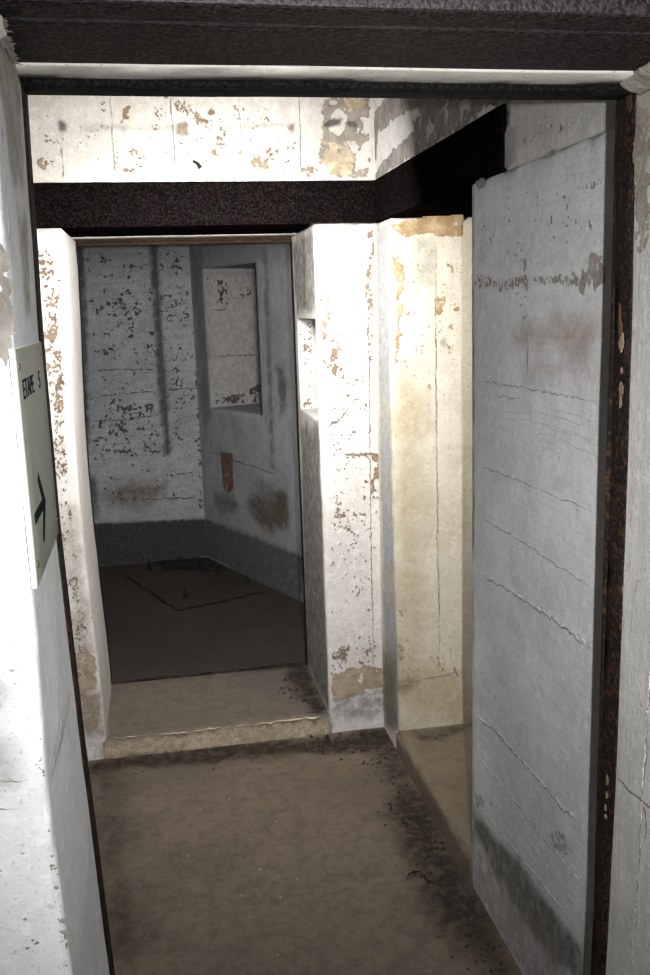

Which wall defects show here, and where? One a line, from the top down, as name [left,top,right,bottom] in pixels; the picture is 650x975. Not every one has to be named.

peeling [151,97,296,171]
peeling [300,98,499,180]
peeling [626,94,650,253]
peeling [391,215,464,237]
peeling [38,249,78,557]
crack [481,467,591,512]
damp [95,427,409,729]
peeling [330,609,383,703]
crack [481,517,585,583]
crack [486,578,590,650]
crack [618,689,650,971]
damp [474,819,581,975]